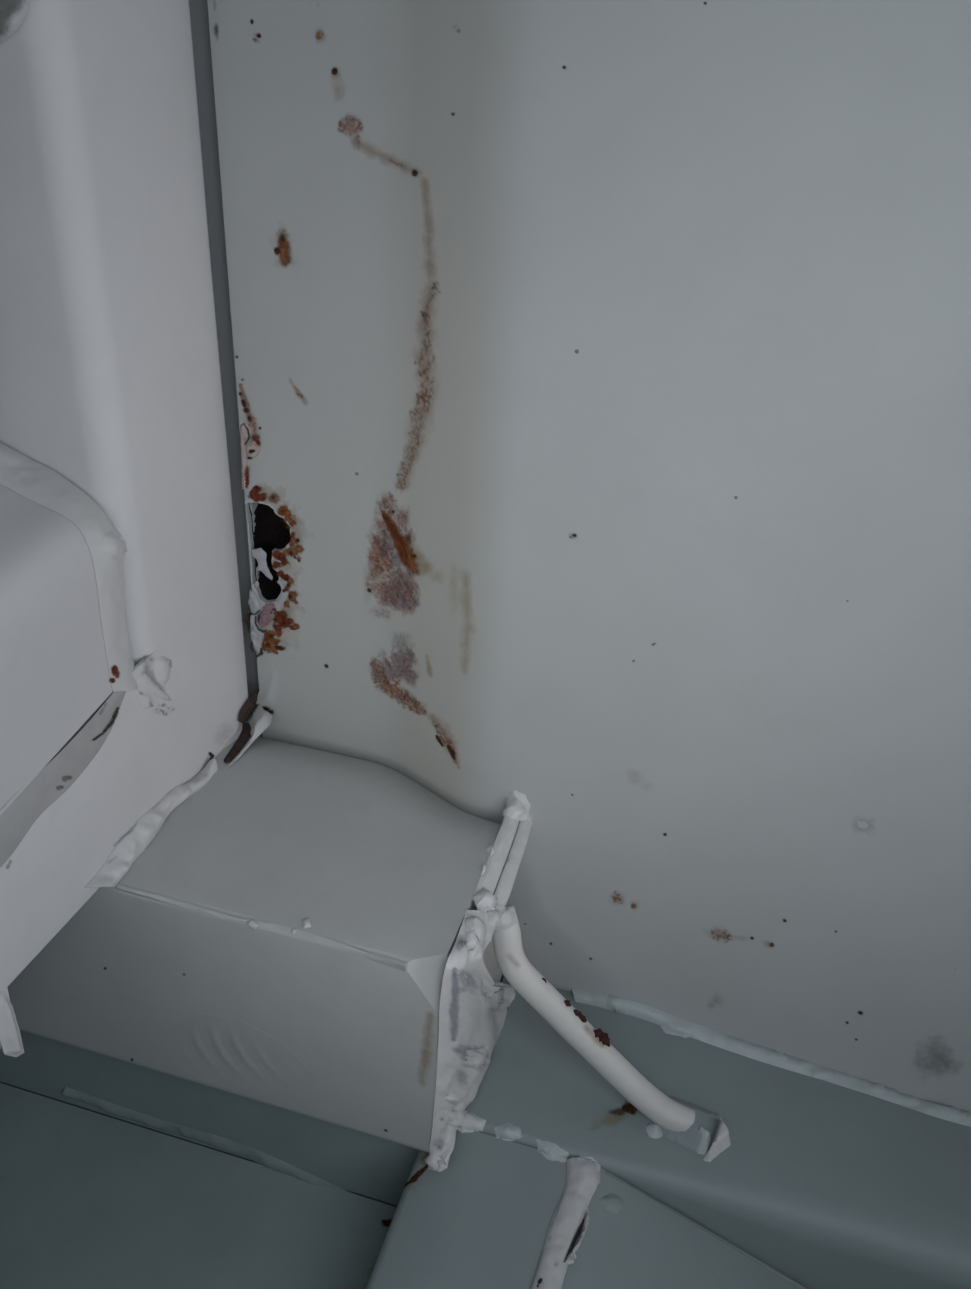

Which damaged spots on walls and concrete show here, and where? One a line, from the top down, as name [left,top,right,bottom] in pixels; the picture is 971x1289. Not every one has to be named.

corrosion [274,236,290,266]
spalling [247,503,291,657]
corrosion [239,379,304,654]
corrosion [367,481,418,611]
corrosion [371,642,426,713]
corrosion [435,725,455,760]
corrosion [564,1000,610,1047]